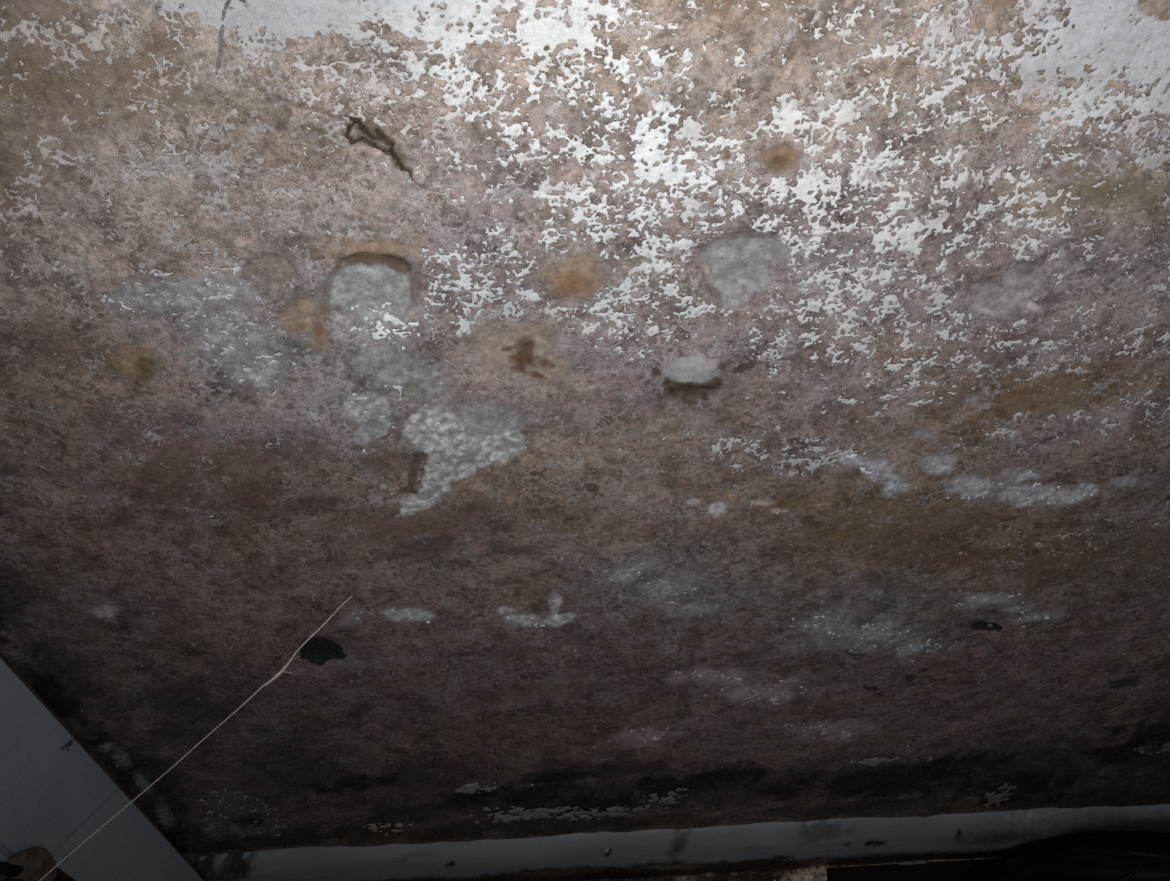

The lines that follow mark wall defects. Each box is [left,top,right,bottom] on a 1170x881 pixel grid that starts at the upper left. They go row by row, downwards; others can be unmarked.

crack [216,0,445,193]
efflorescence [100,256,282,404]
peeling [0,0,1170,634]
leakage [341,345,527,554]
leakage [687,499,725,516]
efflorescence [836,449,908,496]
efflorescence [922,456,1099,507]
peeling [0,433,431,778]
efflorescence [384,608,434,624]
efflorescence [498,592,575,628]
efflorescence [790,611,942,662]
leakage [87,708,1170,881]